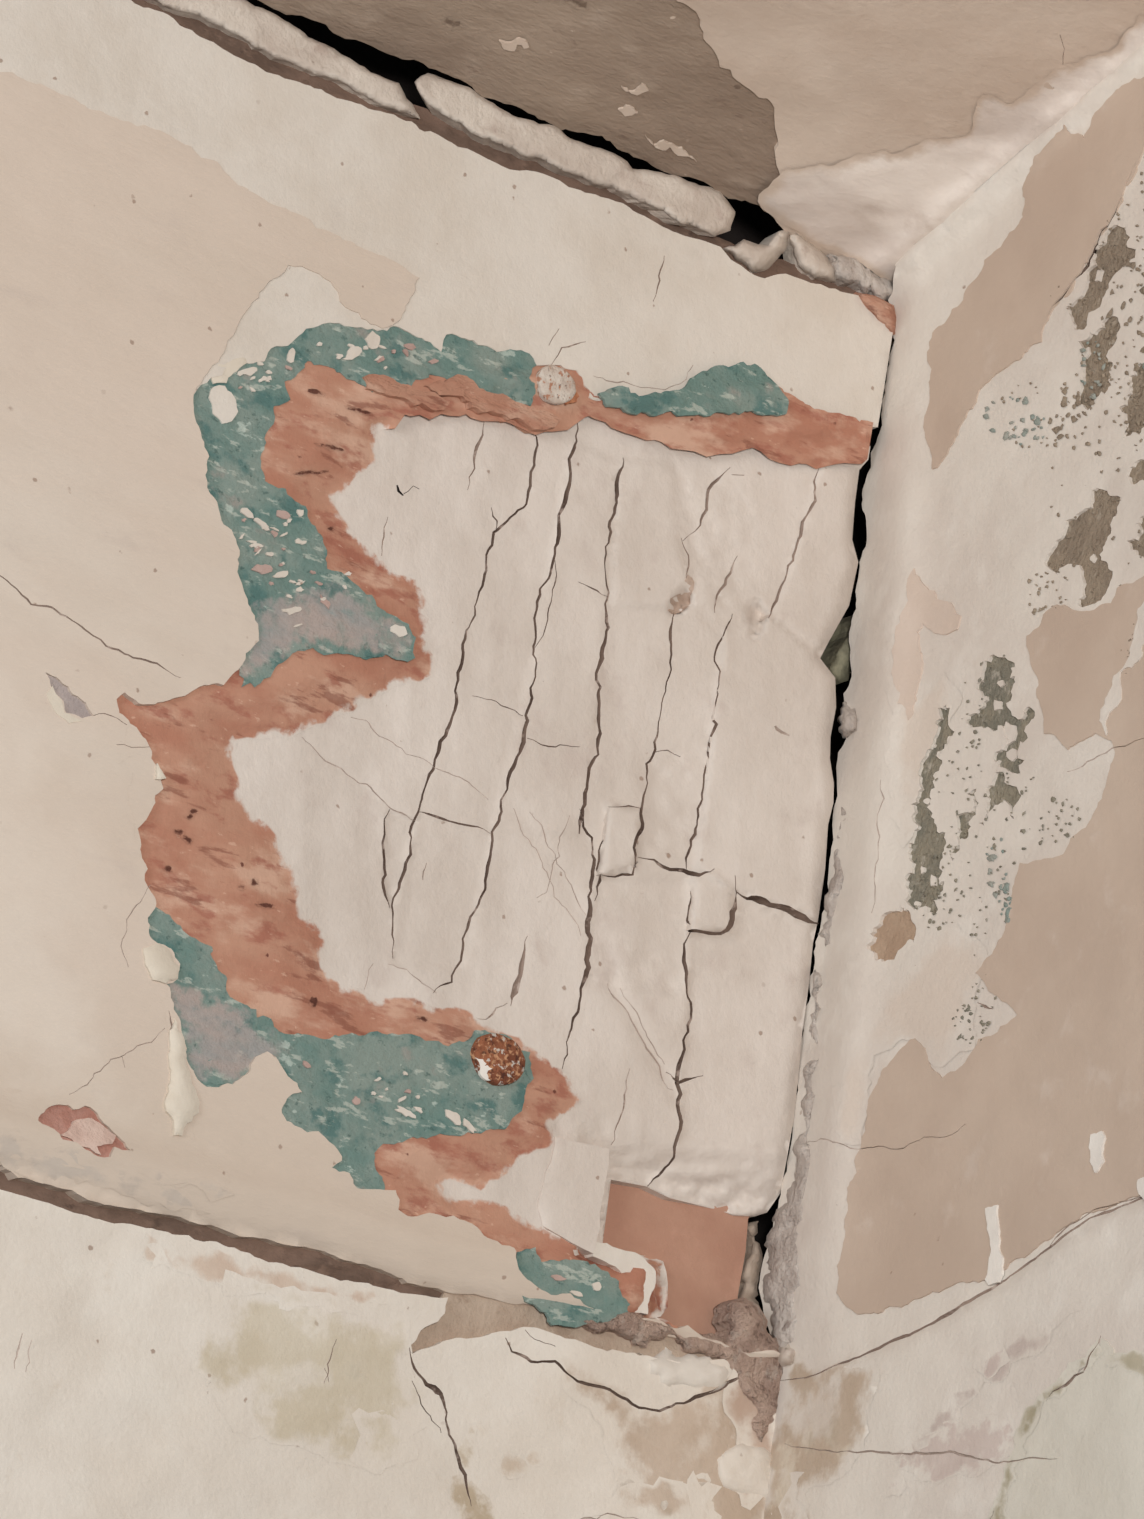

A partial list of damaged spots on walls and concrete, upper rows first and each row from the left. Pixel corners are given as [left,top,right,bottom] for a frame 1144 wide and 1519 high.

crack [653,256,665,302]
peeling [923,77,1144,469]
flaking render [1129,460,1144,484]
crack [0,575,181,678]
peeling [0,0,893,1360]
crack [364,423,819,1187]
water stain [884,671,962,848]
peeling [836,489,1144,1315]
crack [409,1348,471,1503]
crack [505,1330,737,1412]
crack [780,1197,1143,1381]
crack [1050,1336,1101,1395]